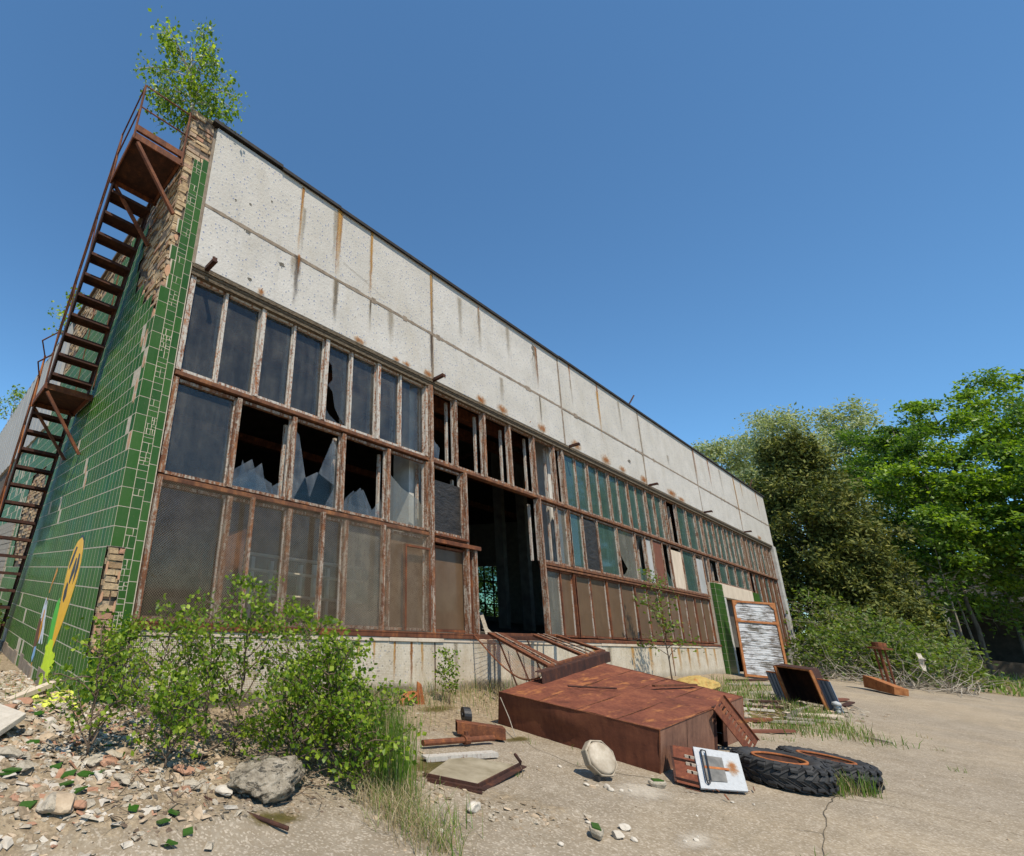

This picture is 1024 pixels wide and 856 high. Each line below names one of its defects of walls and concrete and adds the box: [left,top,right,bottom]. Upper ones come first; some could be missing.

spalling [63,110,214,402]
rust [335,209,343,251]
spalling [90,546,126,653]